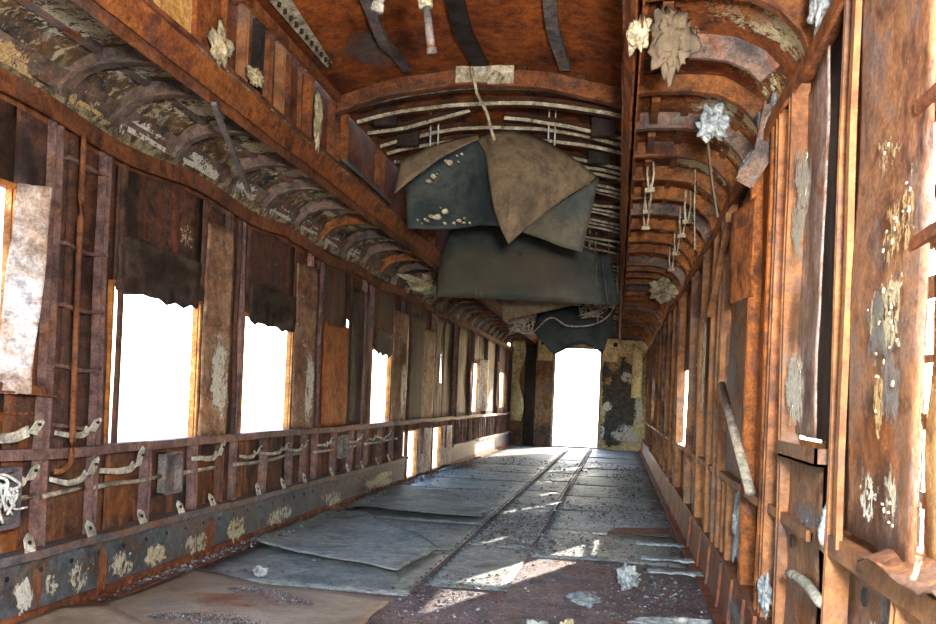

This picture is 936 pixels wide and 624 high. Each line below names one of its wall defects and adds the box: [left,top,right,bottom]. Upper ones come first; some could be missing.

peeling [790,136,811,266]
peeling [867,182,915,441]
peeling [784,348,804,426]
peeling [600,398,643,444]
peeling [859,469,898,529]
peeling [13,577,34,616]
peeling [45,562,89,595]
rust [97,549,106,597]